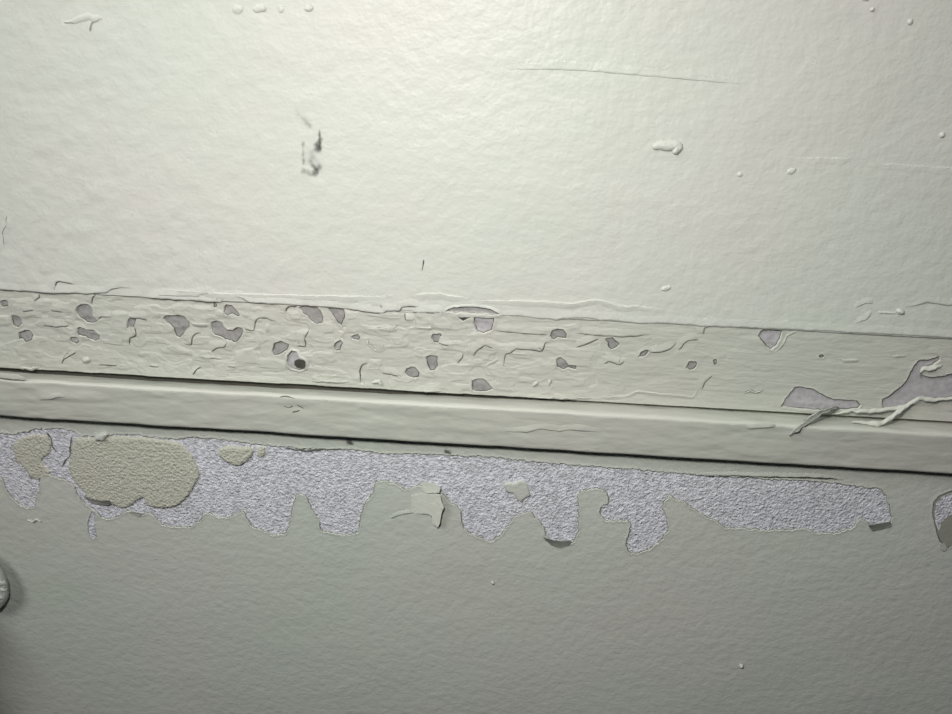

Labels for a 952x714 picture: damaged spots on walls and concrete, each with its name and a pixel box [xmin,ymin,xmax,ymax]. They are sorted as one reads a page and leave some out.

peeling [0,292,40,344]
peeling [43,294,112,363]
peeling [121,310,147,345]
peeling [154,286,400,383]
peeling [382,304,708,394]
peeling [779,385,863,412]
peeling [879,355,952,408]
peeling [0,426,895,556]
peeling [930,489,952,551]